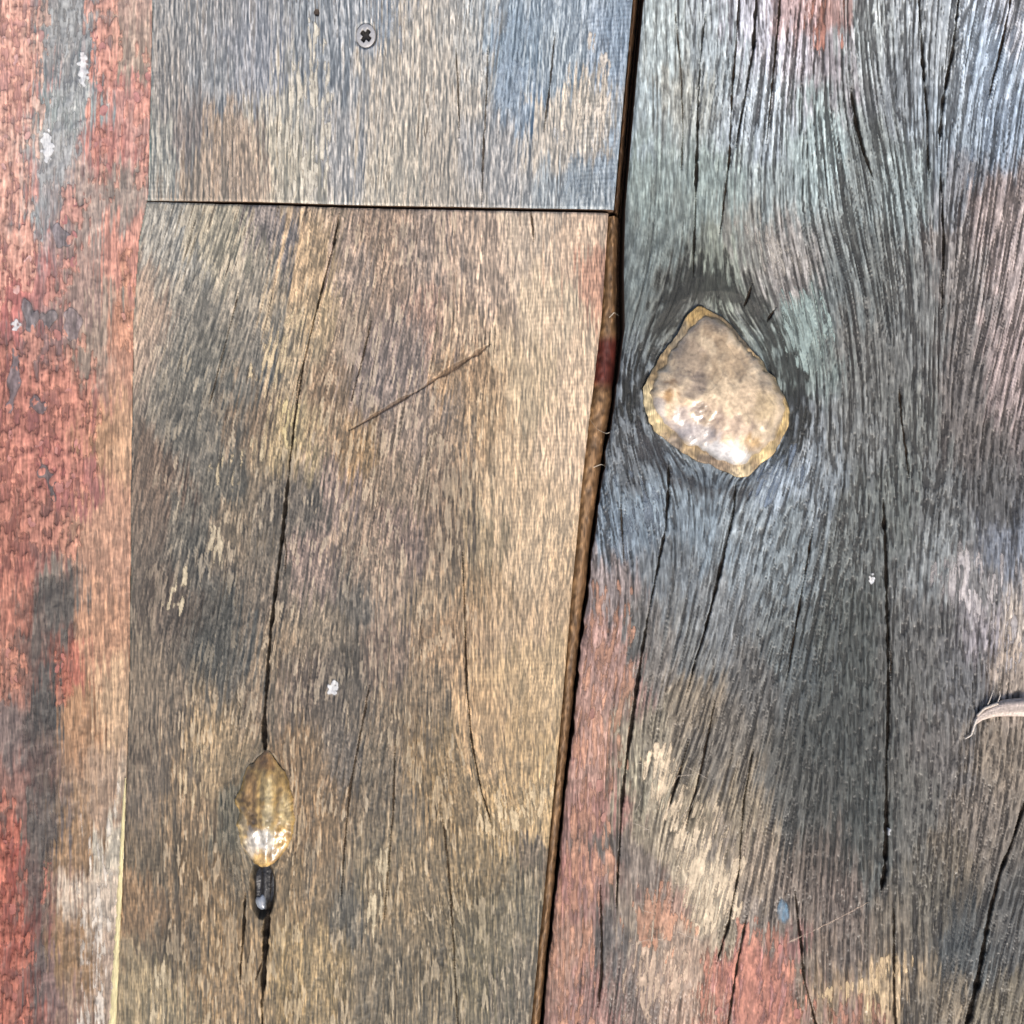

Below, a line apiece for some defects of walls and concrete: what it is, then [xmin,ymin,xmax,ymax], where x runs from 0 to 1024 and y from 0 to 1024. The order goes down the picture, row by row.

crack [851,92,873,177]
peeling [0,0,151,567]
crack [261,216,339,749]
crack [462,563,490,818]
crack [599,465,670,1002]
crack [670,704,715,821]
crack [688,486,736,688]
crack [880,502,891,889]
crack [240,872,272,1024]
crack [965,804,1024,1024]